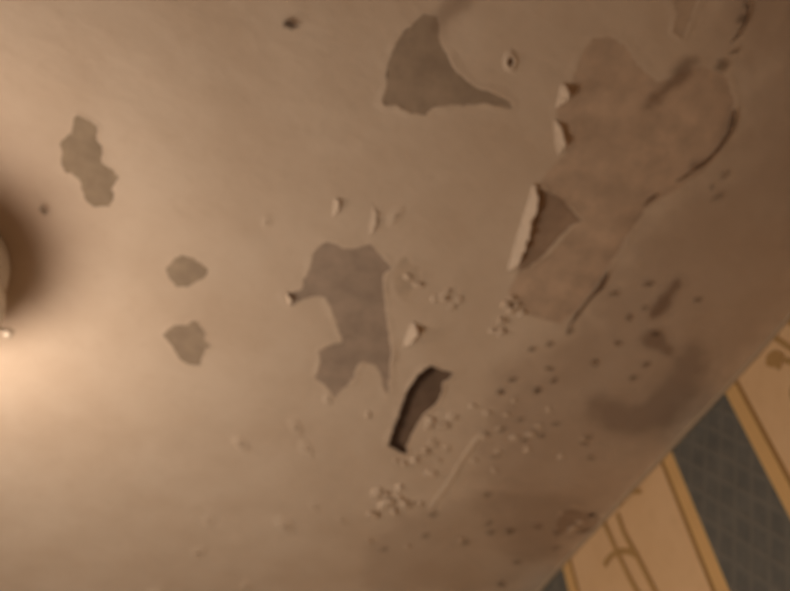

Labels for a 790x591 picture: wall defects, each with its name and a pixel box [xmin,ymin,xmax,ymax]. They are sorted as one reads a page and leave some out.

peeling [374,7,520,122]
peeling [56,110,123,211]
peeling [488,28,743,336]
peeling [160,250,211,290]
peeling [159,317,216,369]
peeling [276,204,459,458]